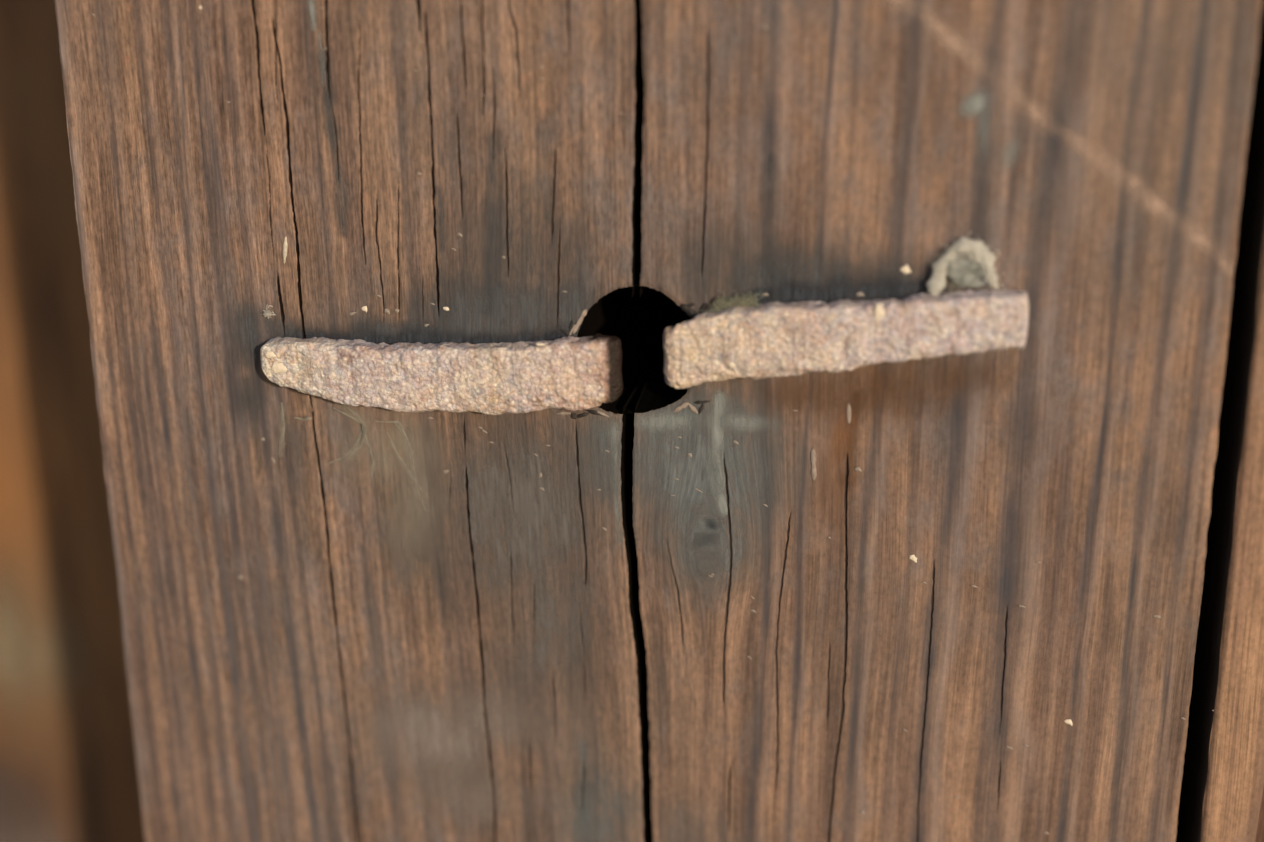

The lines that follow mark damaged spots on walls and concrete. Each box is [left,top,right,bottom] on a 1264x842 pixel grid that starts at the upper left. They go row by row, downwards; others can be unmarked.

crack [251,0,306,339]
crack [632,0,646,297]
crack [449,419,496,842]
crack [510,555,535,643]
crack [620,349,660,842]
crack [666,539,684,649]
crack [722,455,732,709]
crack [725,769,733,831]
crack [775,514,791,793]
crack [826,456,849,842]